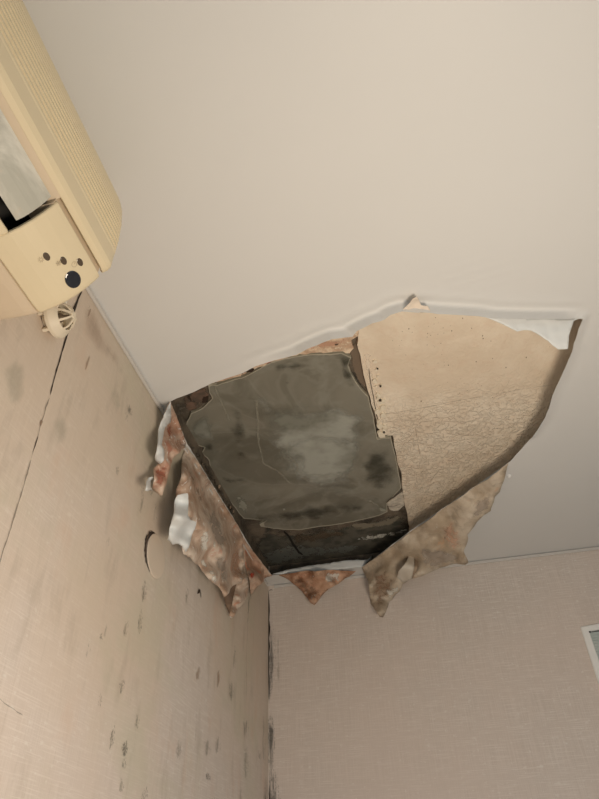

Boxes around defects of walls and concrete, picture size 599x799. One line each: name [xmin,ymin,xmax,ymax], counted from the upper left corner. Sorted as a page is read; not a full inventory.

spalling [217,330,359,382]
spalling [184,388,209,410]
peeling [374,399,386,438]
spalling [193,447,234,514]
damp [171,340,408,575]
spalling [386,489,404,511]